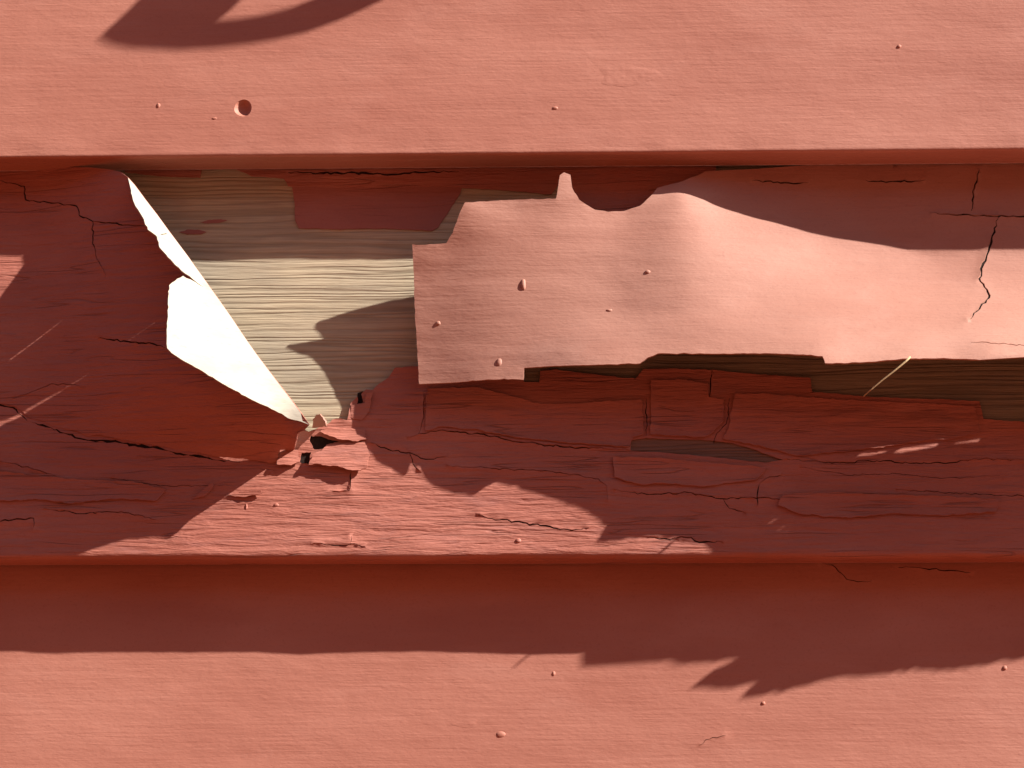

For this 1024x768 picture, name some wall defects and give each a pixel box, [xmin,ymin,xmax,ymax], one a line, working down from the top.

crack [2,181,139,263]
crack [954,172,1024,317]
crack [103,338,165,348]
peeling [0,163,1024,471]
crack [376,430,590,473]
crack [625,459,1022,512]
crack [479,515,582,531]
crack [652,536,720,544]